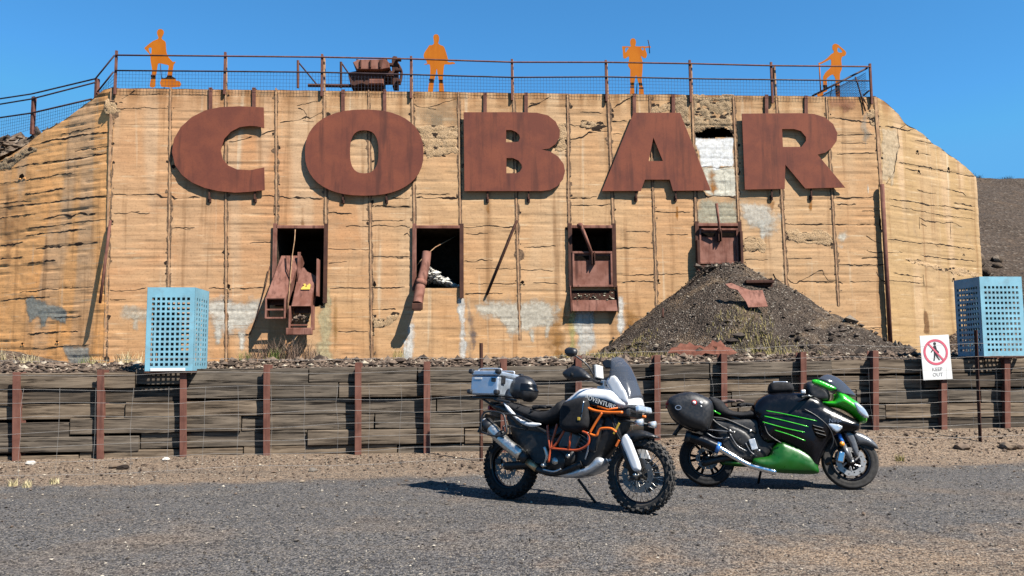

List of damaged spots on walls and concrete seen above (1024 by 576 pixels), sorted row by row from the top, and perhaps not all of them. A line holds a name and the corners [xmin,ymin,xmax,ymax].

crack [0,90,197,264]
spalling [409,97,464,224]
spalling [651,180,661,307]
spalling [648,94,741,223]
damp [695,138,773,239]
crack [773,97,975,284]